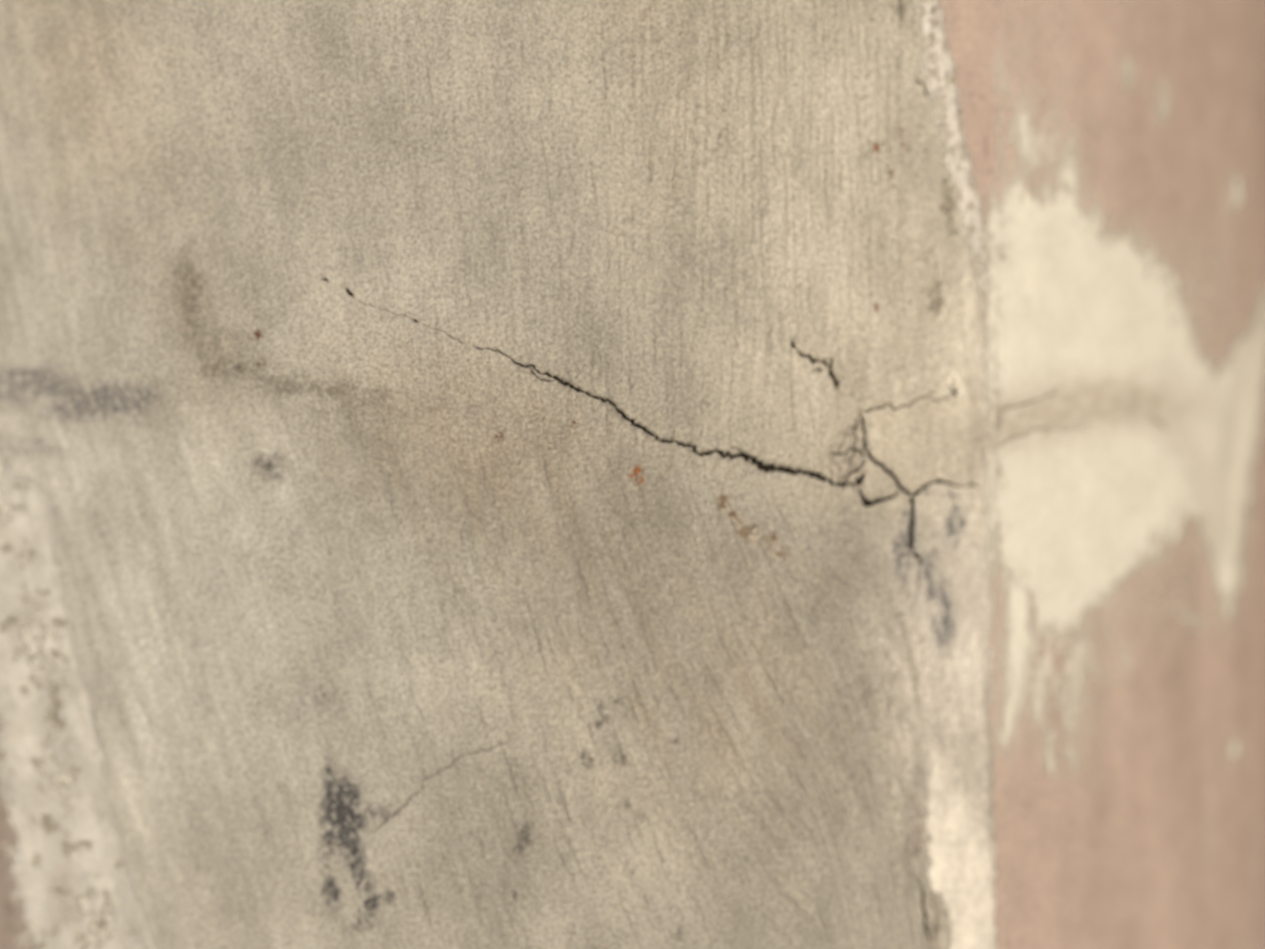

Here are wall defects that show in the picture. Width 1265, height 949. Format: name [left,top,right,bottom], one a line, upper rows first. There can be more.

crack [321,278,979,604]
peeling [0,465,156,949]